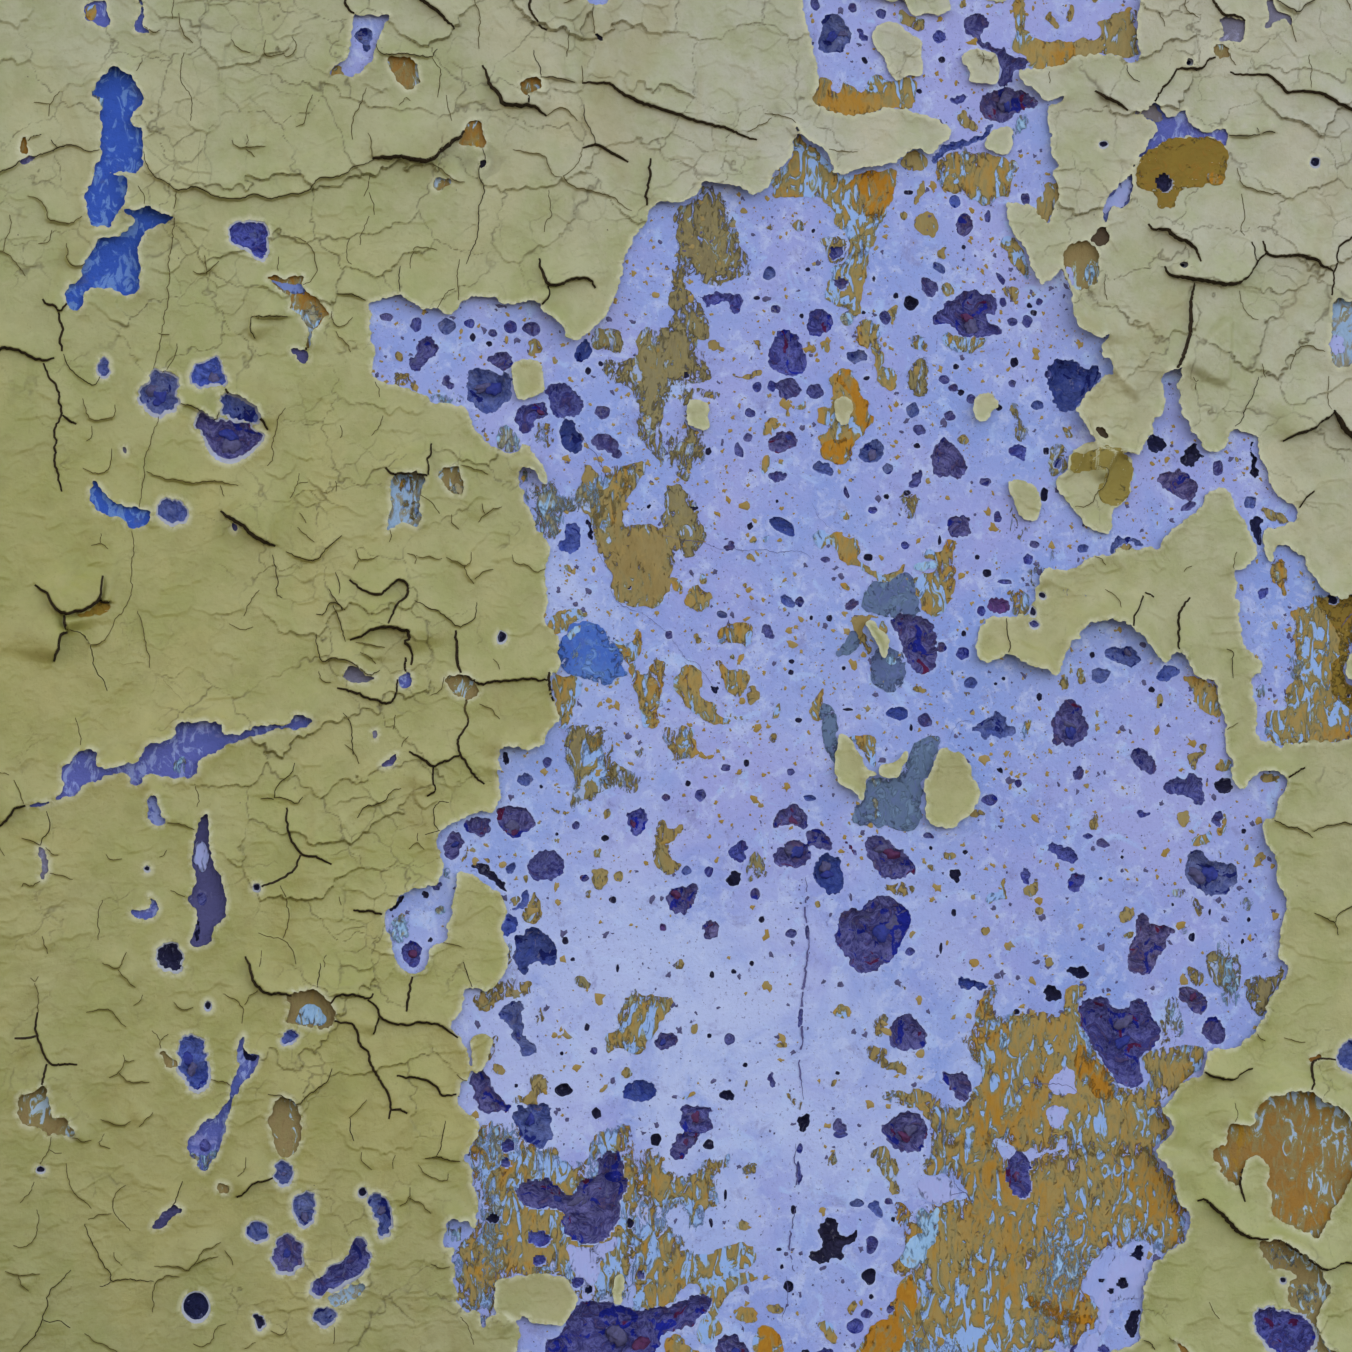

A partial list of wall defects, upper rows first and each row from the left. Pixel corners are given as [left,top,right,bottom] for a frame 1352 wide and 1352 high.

crack [0,196,116,492]
peeling [48,0,190,328]
spalling [228,219,270,262]
peeling [313,0,437,107]
crack [136,0,796,373]
crack [1094,0,1352,111]
crack [1148,168,1352,387]
crack [34,389,554,849]
peeling [326,650,496,717]
peeling [352,0,1352,1352]
peeling [13,699,330,974]
crack [225,763,467,1214]